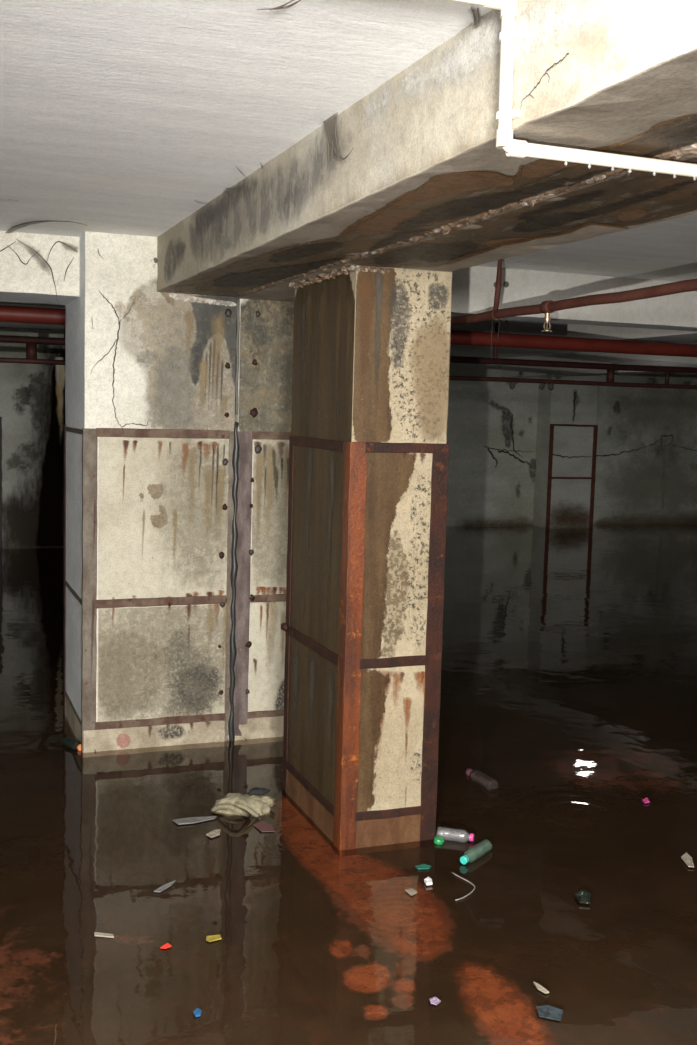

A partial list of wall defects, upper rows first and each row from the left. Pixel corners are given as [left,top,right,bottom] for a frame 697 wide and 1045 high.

damp [368,13,501,113]
damp [514,0,611,64]
crack [90,291,148,433]
corrosion [159,441,225,516]
corrosion [255,442,289,506]
damp [126,138,697,806]
corrosion [353,266,431,812]
damp [99,606,226,717]
corrosion [187,590,228,633]